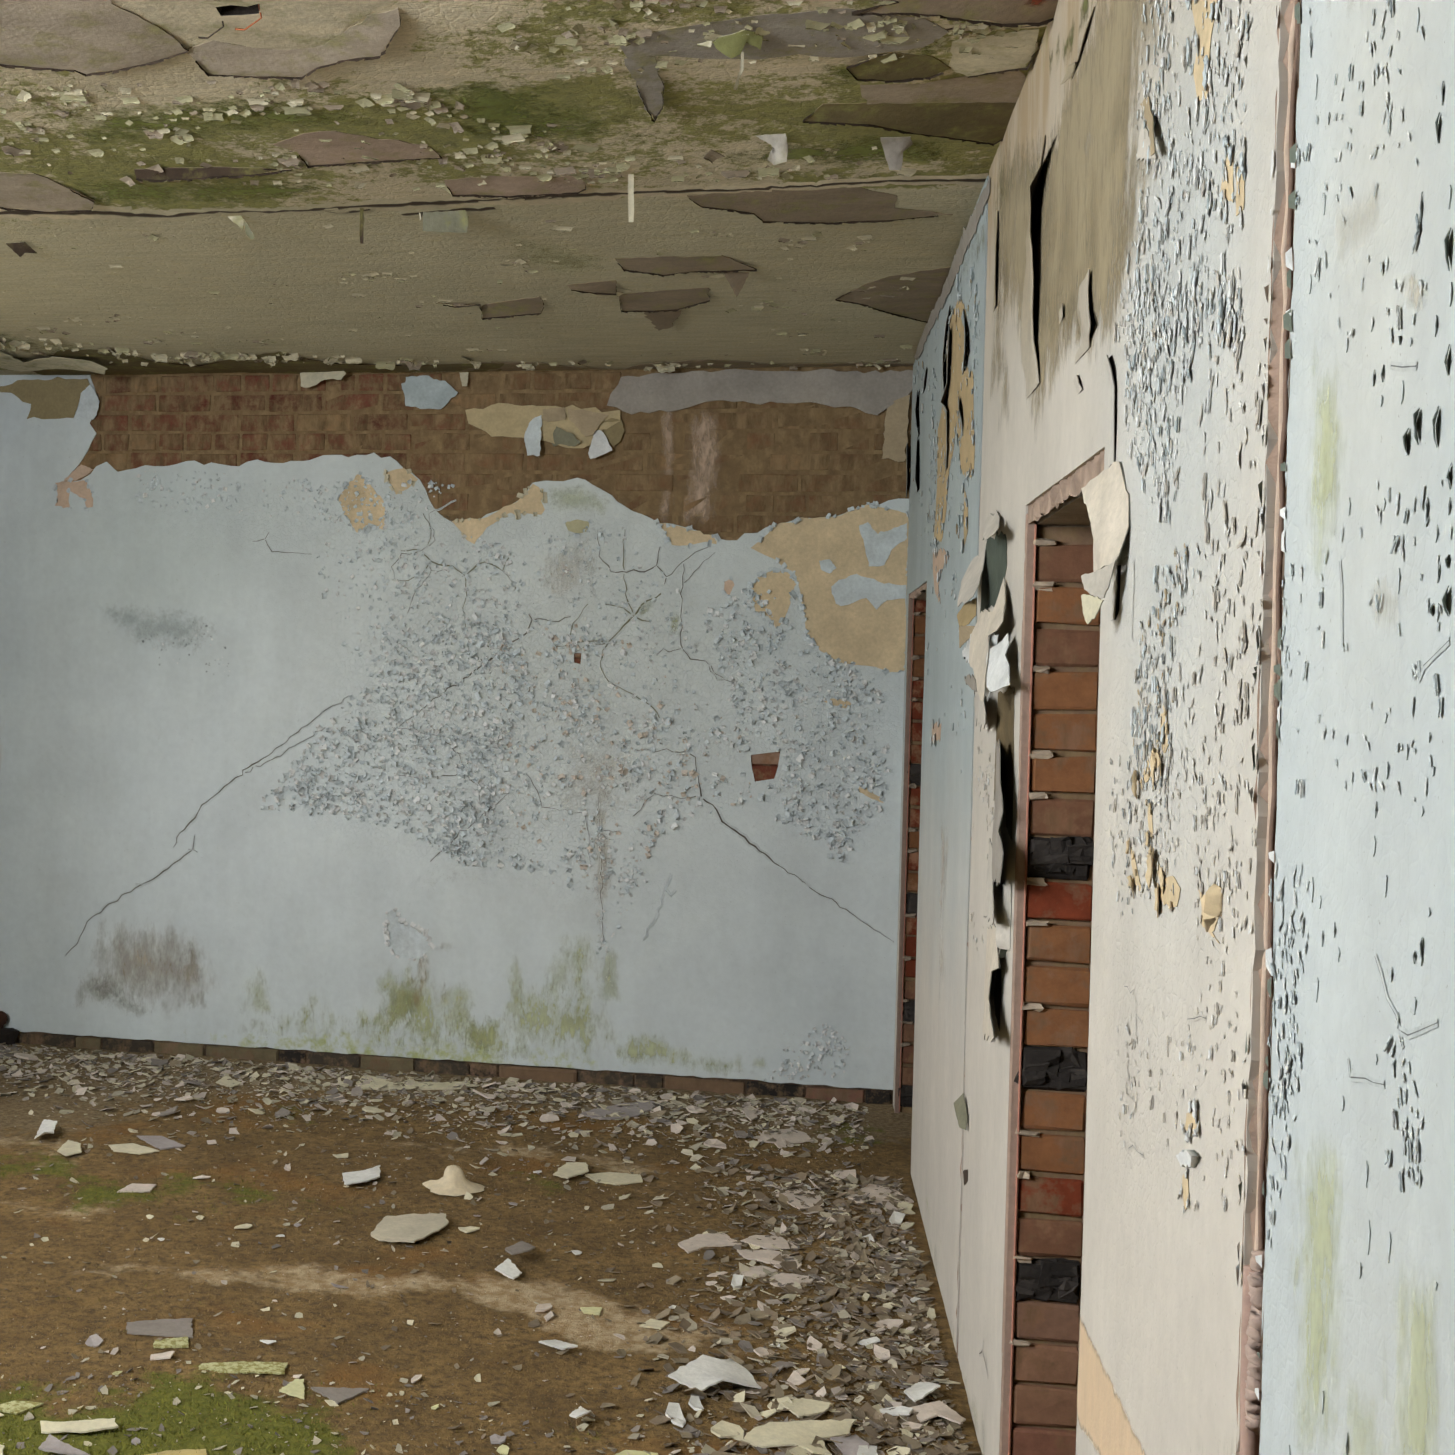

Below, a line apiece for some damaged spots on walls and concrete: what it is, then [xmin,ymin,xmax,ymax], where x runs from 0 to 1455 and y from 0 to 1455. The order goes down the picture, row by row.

peeling [1276,0,1410,162]
water stain [999,0,1145,405]
peeling [1337,255,1426,352]
peeling [1434,228,1452,375]
peeling [1401,380,1439,455]
crack [65,695,349,956]
flaking render [0,0,1058,1042]
crack [390,500,894,943]
peeling [1028,0,1340,1285]
peeling [1317,663,1441,818]
peeling [1368,463,1452,630]
peeling [1365,997,1423,1193]